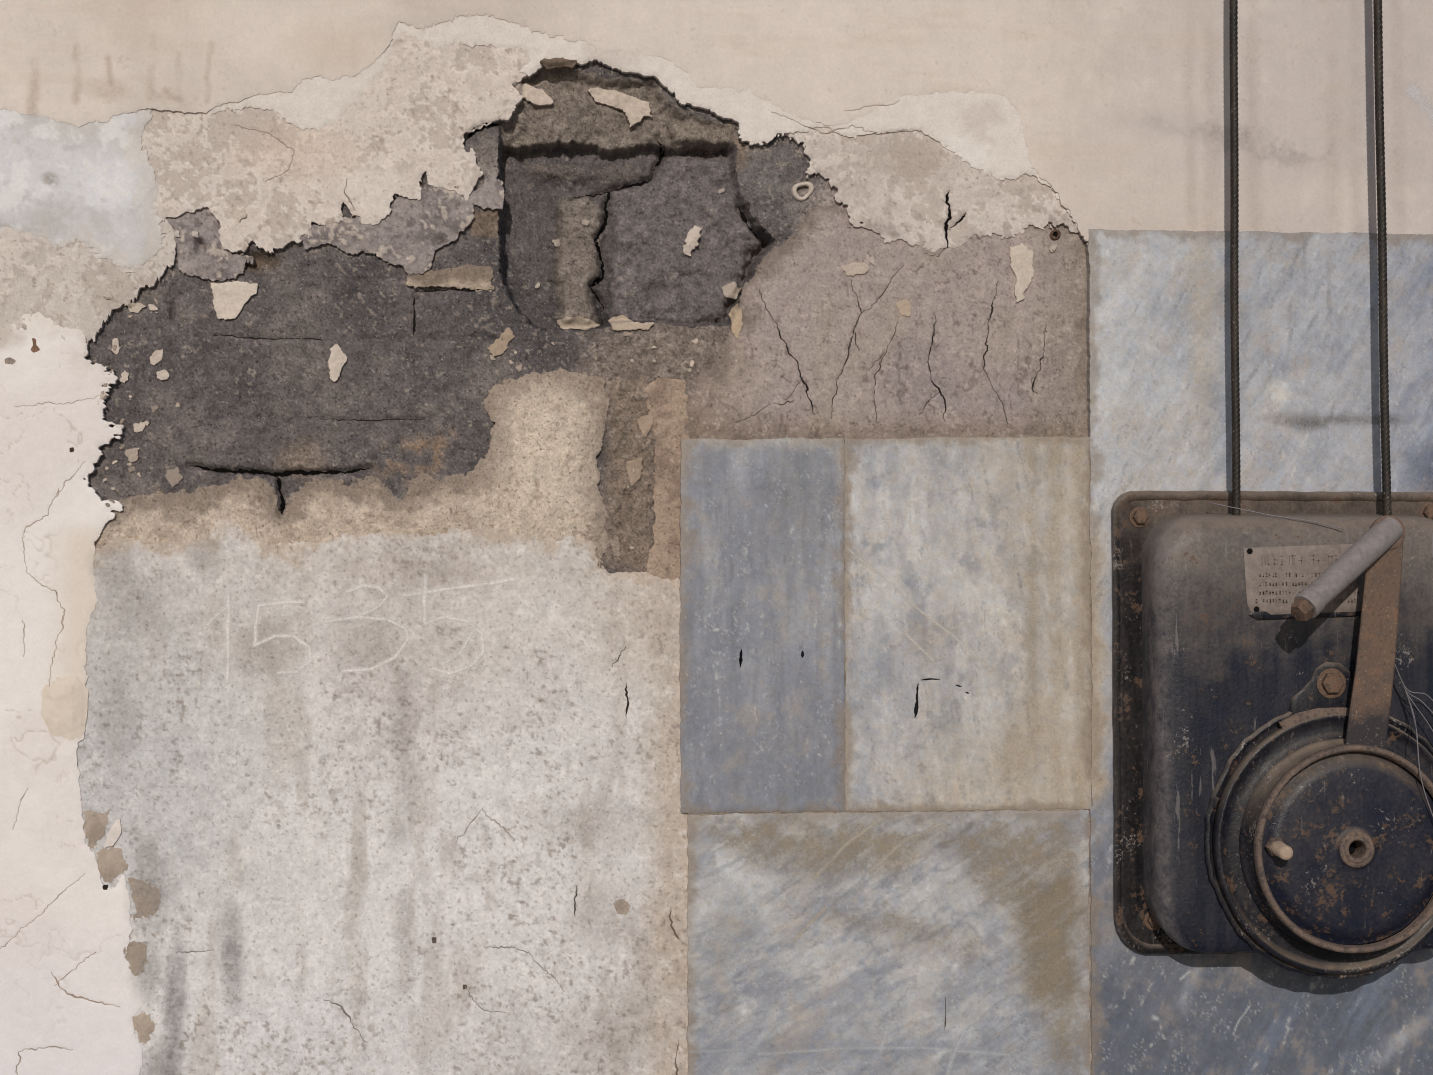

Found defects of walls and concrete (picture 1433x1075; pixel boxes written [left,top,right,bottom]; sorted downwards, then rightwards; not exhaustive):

spalling [0,32,1088,581]
crack [735,190,967,423]
crack [983,281,1047,424]
crack [189,465,370,515]
peeling [83,809,161,922]
peeling [123,941,147,976]
peeling [132,1012,155,1044]